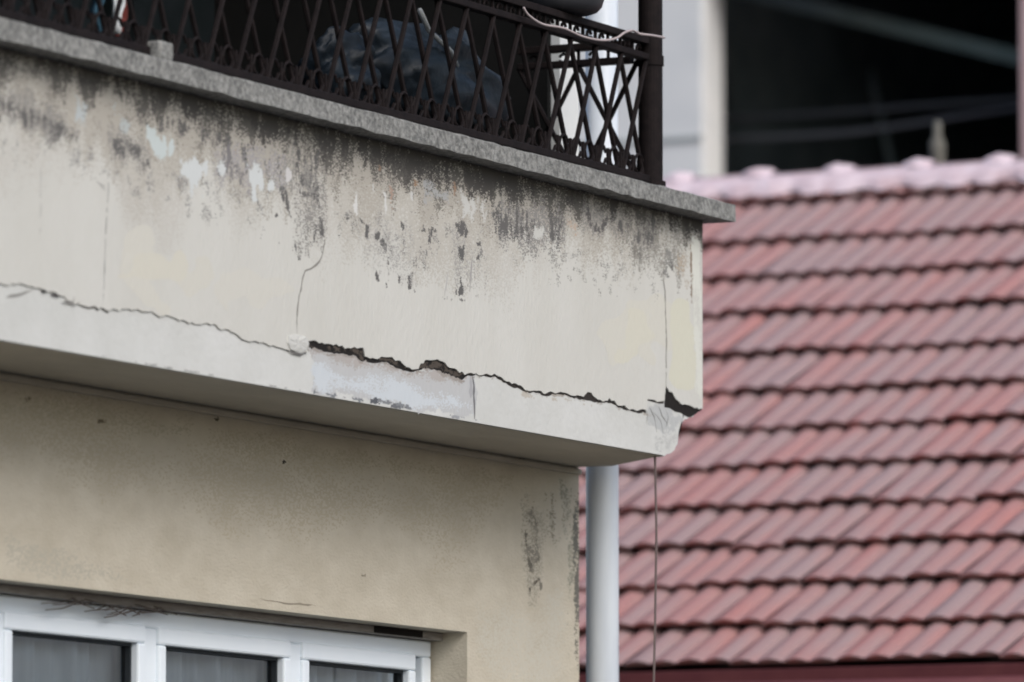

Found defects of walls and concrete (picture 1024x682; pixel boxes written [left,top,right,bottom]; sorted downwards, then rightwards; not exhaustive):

damp [0,382,579,681]
damp [0,47,703,390]
crack [1,173,702,431]
spalling [307,343,502,419]
spalling [643,403,683,452]